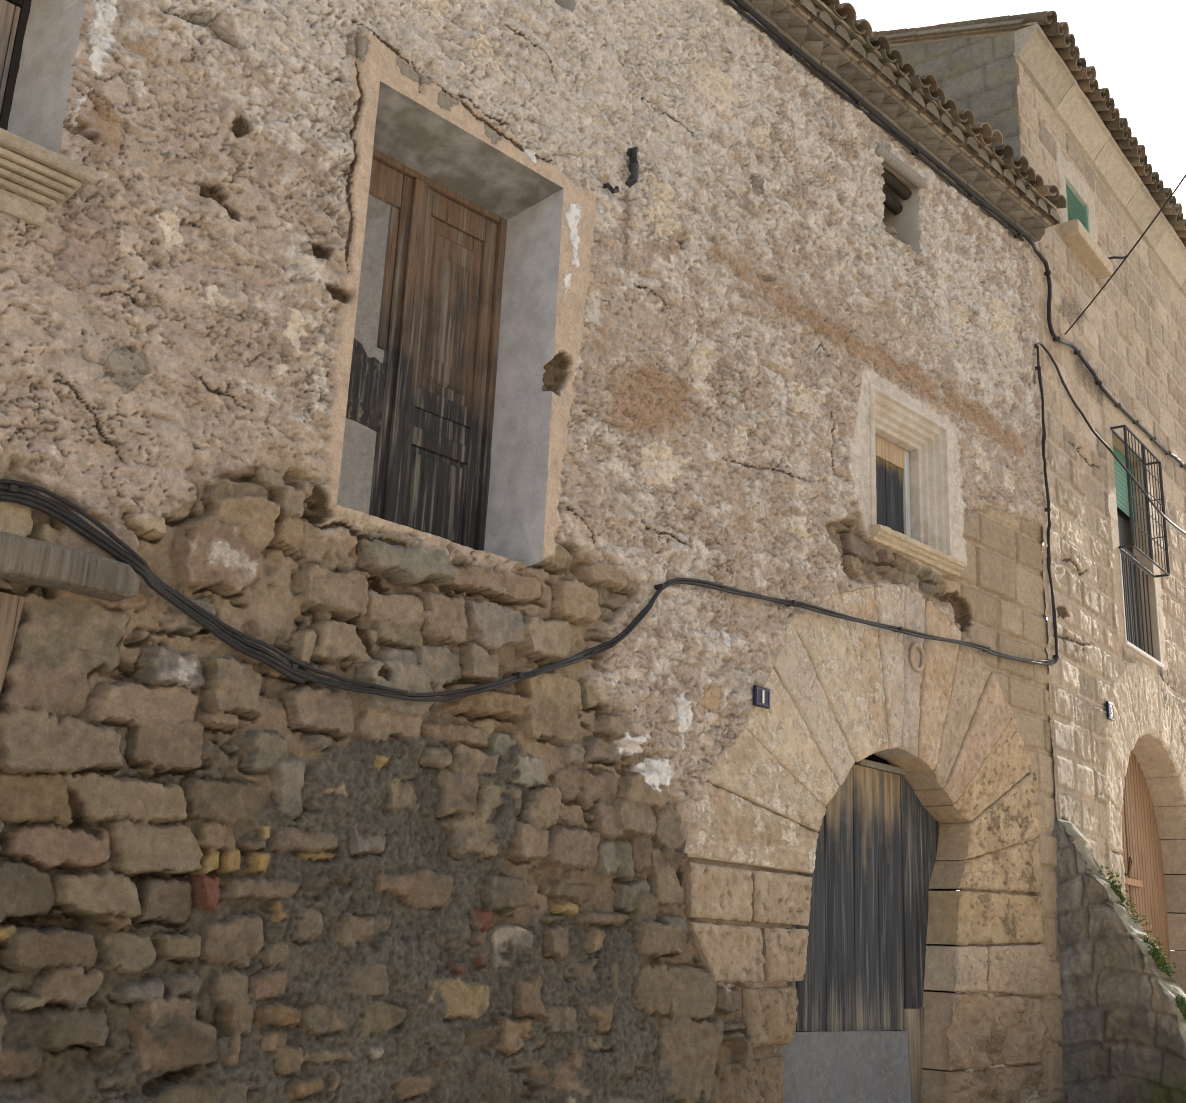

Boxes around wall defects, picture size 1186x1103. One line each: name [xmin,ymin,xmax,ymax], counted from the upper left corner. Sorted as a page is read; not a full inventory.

crack [352,20,553,163]
crack [344,62,363,272]
spalling [542,353,568,395]
crack [53,379,121,460]
crack [723,457,805,481]
crack [1062,558,1087,577]
spalling [938,592,969,632]
peeling [612,732,675,792]